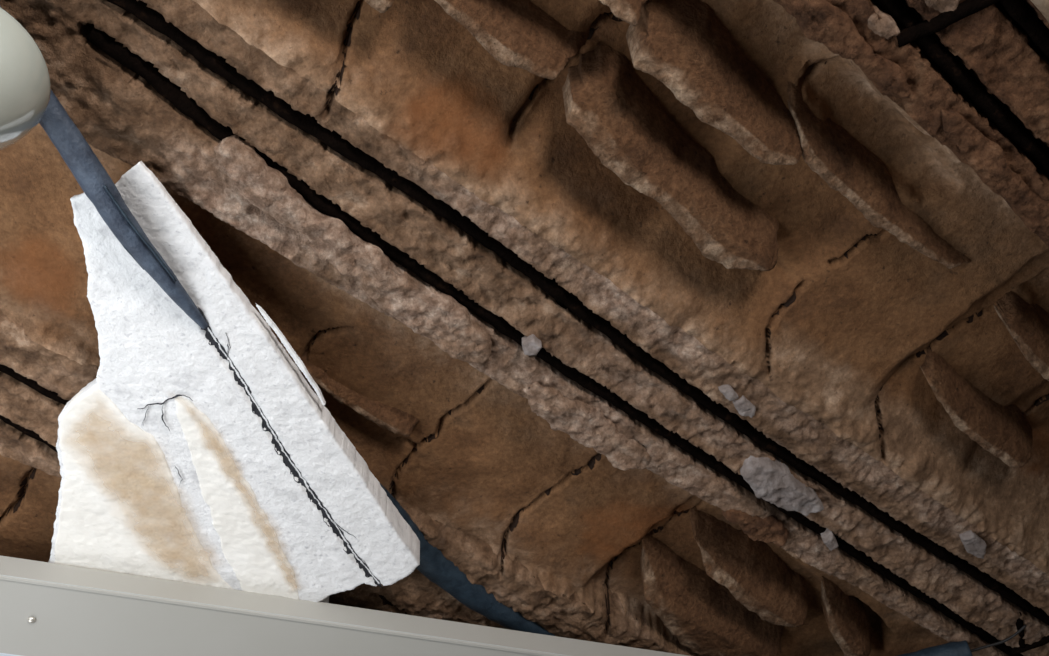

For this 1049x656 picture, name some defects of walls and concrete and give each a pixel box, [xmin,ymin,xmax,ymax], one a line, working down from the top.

spalling [0,455,62,562]
water stain [79,417,204,576]
water stain [204,427,251,500]
flaking render [48,144,420,603]
spalling [0,0,776,478]
crack [389,409,452,495]
crack [501,453,601,570]
spalling [193,0,1049,575]
spalling [469,311,1049,656]
crack [765,289,796,349]
crack [875,386,884,451]
crack [916,310,982,358]